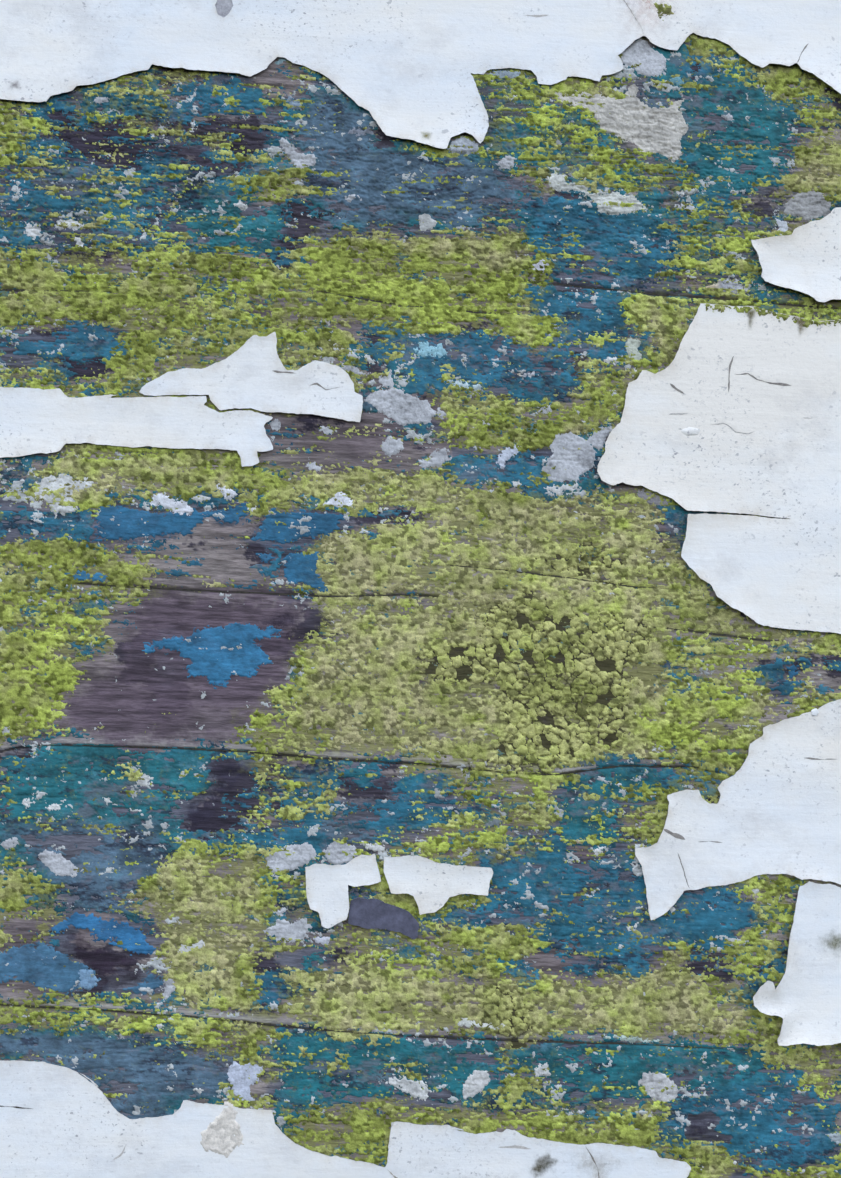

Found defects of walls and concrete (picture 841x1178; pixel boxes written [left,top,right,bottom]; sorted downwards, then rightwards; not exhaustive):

peeling [0,0,841,149]
peeling [0,332,363,478]
peeling [104,479,268,511]
peeling [580,207,841,695]
peeling [0,545,141,661]
peeling [305,829,493,939]
peeling [635,689,841,1046]
peeling [238,945,345,1012]
crack [0,1004,752,1051]
peeling [457,1018,505,1030]
peeling [0,1060,691,1178]
crack [499,1143,530,1151]